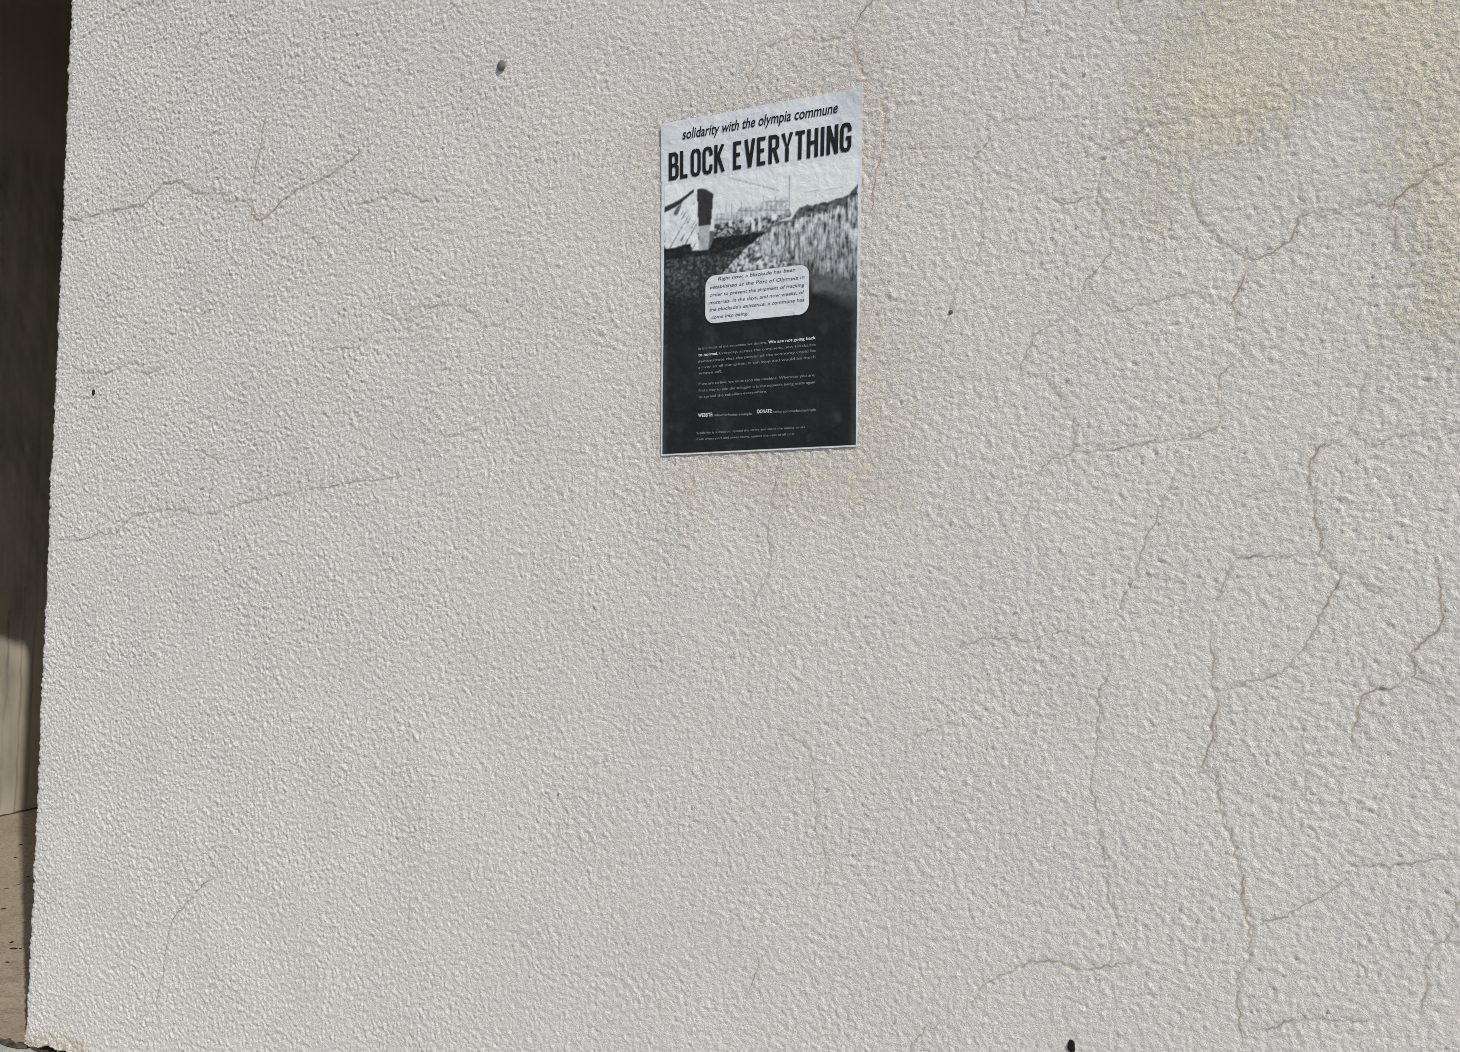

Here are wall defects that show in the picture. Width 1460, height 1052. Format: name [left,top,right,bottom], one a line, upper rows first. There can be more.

crack [71,125,284,221]
crack [1372,178,1424,209]
crack [1231,230,1295,303]
crack [1314,519,1380,621]
crack [1357,578,1445,720]
crack [1203,705,1221,805]
crack [1237,987,1288,1032]